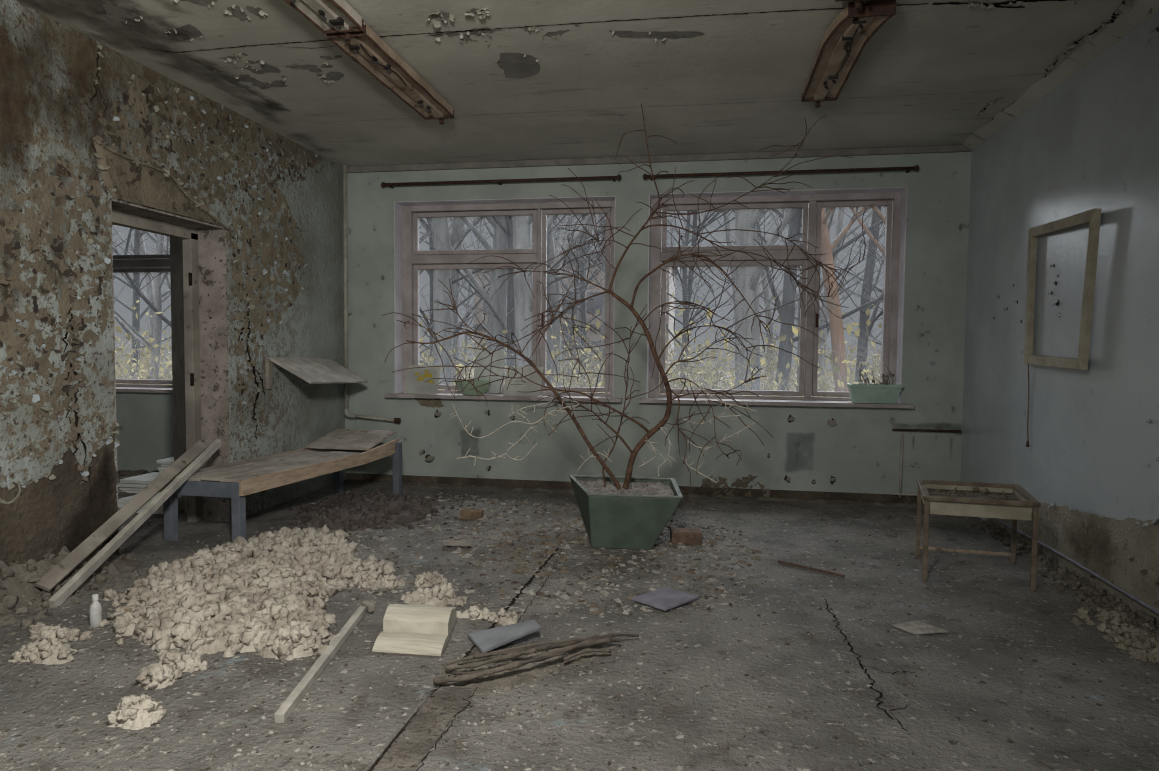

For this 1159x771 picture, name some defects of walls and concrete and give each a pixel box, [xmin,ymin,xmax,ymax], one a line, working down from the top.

damp [0,24,122,171]
damp [20,0,217,82]
peeling [209,53,344,89]
peeling [495,53,540,79]
crack [379,8,844,37]
crack [896,0,1079,9]
peeling [0,74,327,421]
peeling [0,423,120,567]
damp [67,459,111,551]
peeling [987,502,1159,627]
crack [363,547,562,771]
crack [825,599,915,731]